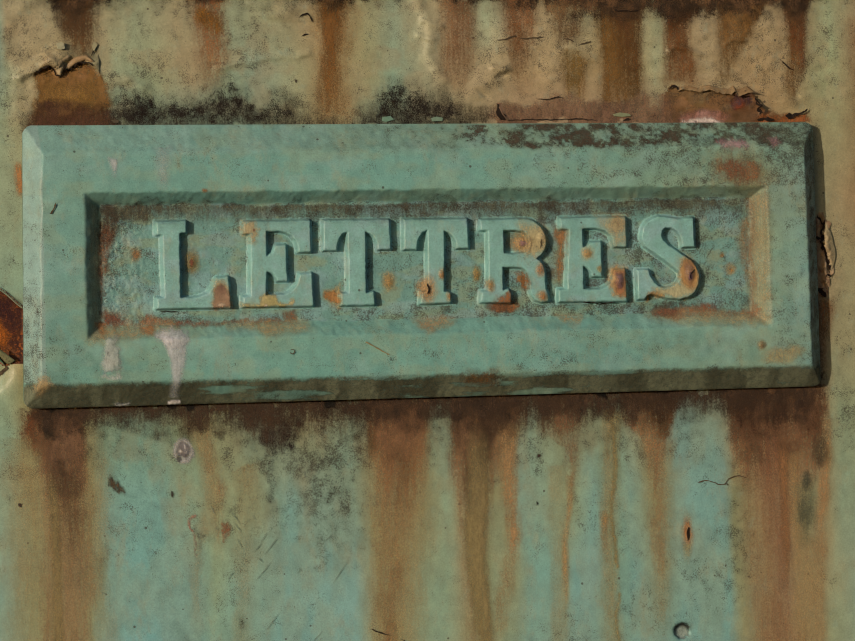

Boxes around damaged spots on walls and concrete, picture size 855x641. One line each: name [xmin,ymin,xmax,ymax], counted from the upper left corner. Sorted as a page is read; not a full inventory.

rust [25,0,117,128]
water stain [110,75,307,125]
rust [321,0,347,113]
peeling [664,84,809,123]
peeling [0,287,23,375]
rust [487,291,519,313]
rust [517,264,544,289]
rust [513,225,566,273]
peeling [815,212,836,297]
rust [19,407,95,641]
rust [625,391,676,539]
rust [728,386,831,610]